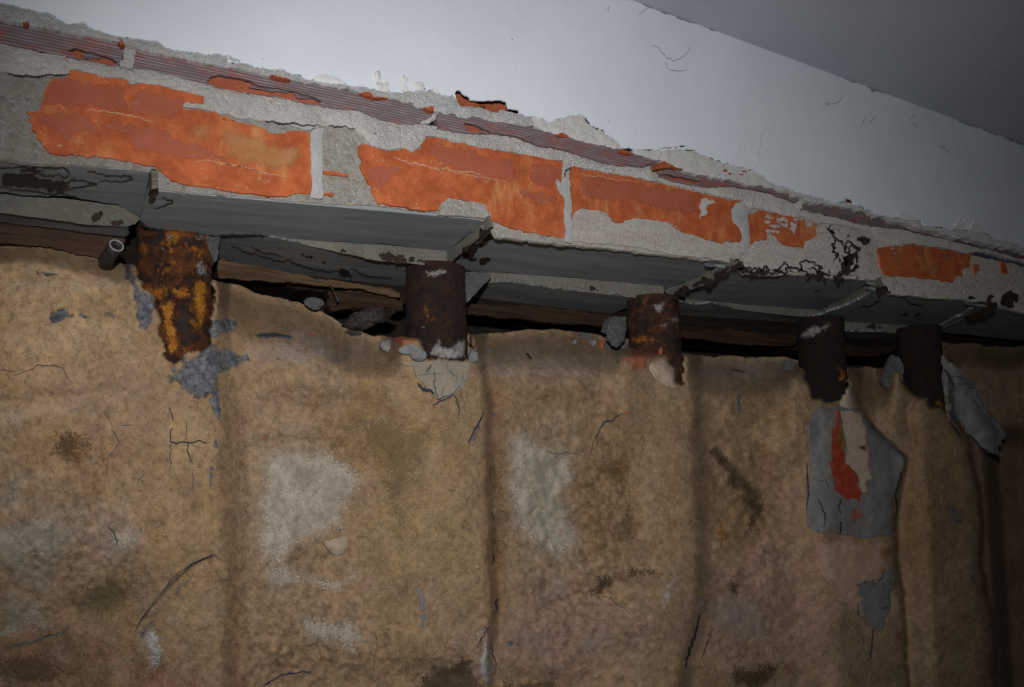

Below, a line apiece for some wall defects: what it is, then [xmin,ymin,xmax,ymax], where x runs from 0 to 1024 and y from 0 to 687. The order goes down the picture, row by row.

flaking render [0,4,921,248]
flaking render [876,244,980,283]
crack [169,407,210,489]
peeling [168,318,250,448]
leakage [245,437,362,593]
leakage [493,431,579,599]
leakage [293,614,387,653]